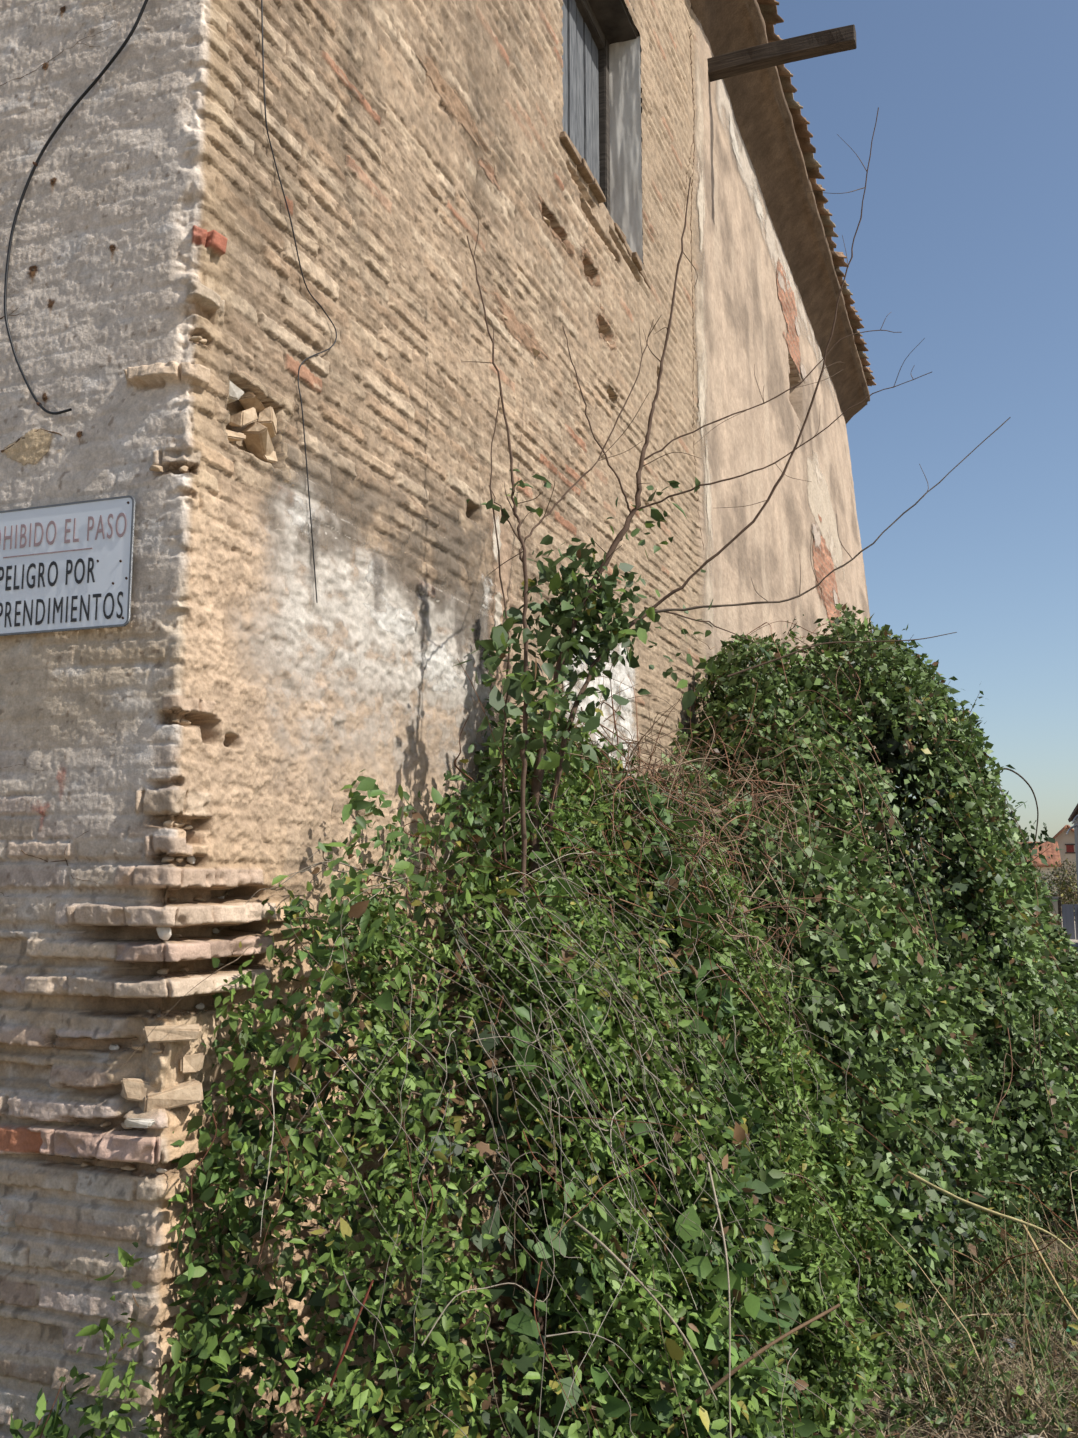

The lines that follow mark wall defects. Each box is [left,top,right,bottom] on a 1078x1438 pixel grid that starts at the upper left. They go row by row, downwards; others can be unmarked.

peeling [695,53,832,627]
peeling [1,428,62,465]
damp [297,469,404,549]
peeling [222,373,513,743]
damp [376,511,495,658]
peeling [807,453,845,624]